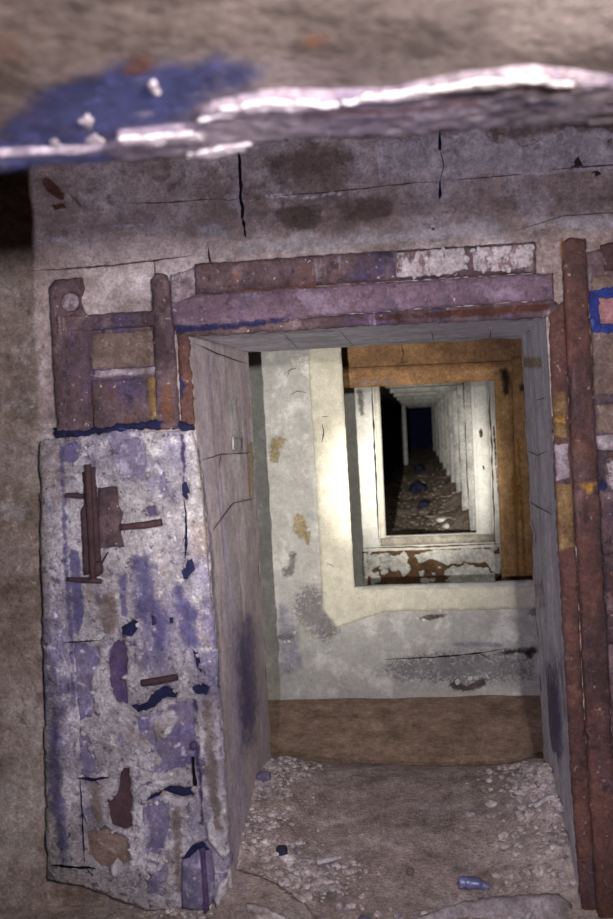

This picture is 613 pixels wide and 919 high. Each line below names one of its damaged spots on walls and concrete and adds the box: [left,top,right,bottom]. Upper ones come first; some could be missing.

spalling [0,64,613,182]
damp [268,146,354,174]
crack [269,132,521,199]
crack [554,163,613,171]
crack [130,153,246,238]
corrosion [413,303,551,318]
peeling [362,545,502,585]